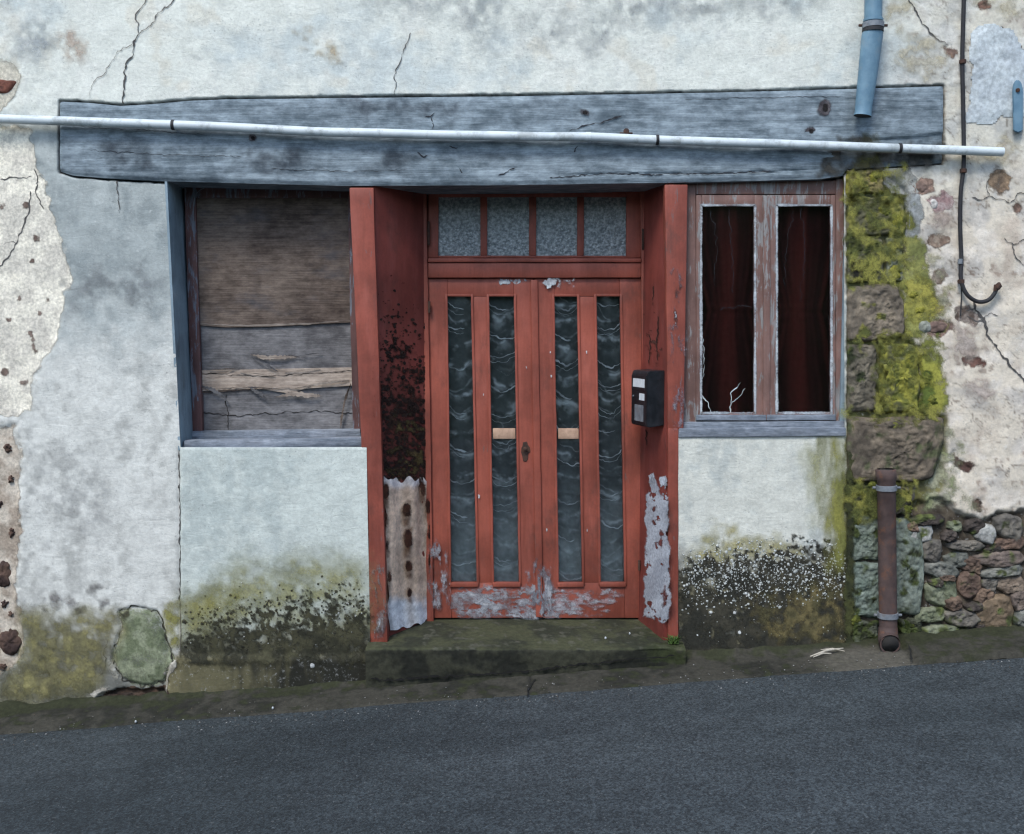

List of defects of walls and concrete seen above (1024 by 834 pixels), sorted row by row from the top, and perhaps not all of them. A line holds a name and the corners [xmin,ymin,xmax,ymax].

flaking render [0,59,21,111]
crack [89,0,174,104]
crack [908,0,974,93]
crack [0,169,44,266]
crack [962,302,1024,381]
flaking render [0,125,73,675]
damp [0,594,124,704]
damp [176,560,371,669]
peeling [427,542,623,620]
peeling [643,473,671,623]
damp [678,437,848,651]
flaking render [907,499,1024,634]